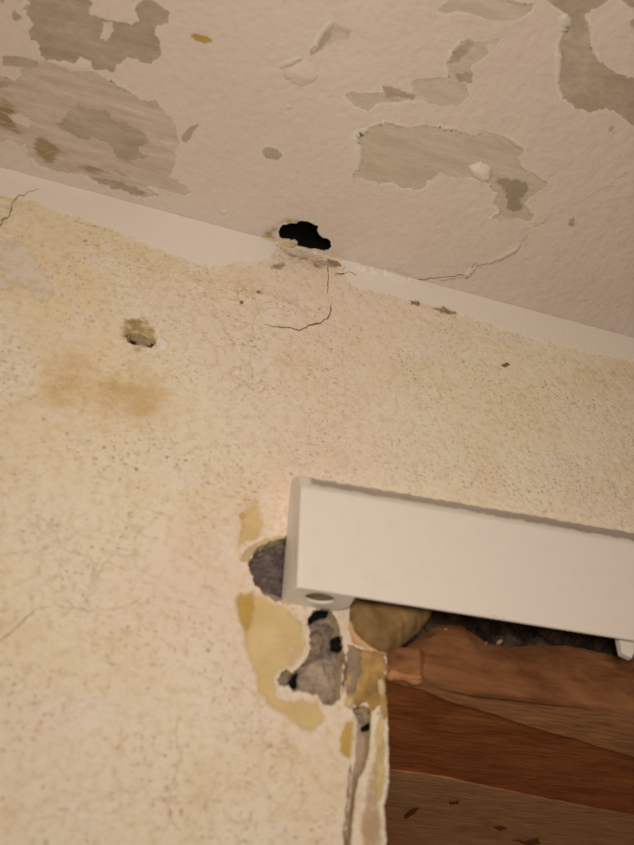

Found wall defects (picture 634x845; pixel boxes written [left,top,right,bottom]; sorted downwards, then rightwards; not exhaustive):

peeling [0,0,198,200]
peeling [342,36,502,114]
peeling [436,0,634,132]
crack [0,189,36,225]
peeling [350,119,549,223]
spalling [123,319,170,350]
crack [265,265,356,331]
spalling [239,535,286,601]
spalling [277,610,389,720]